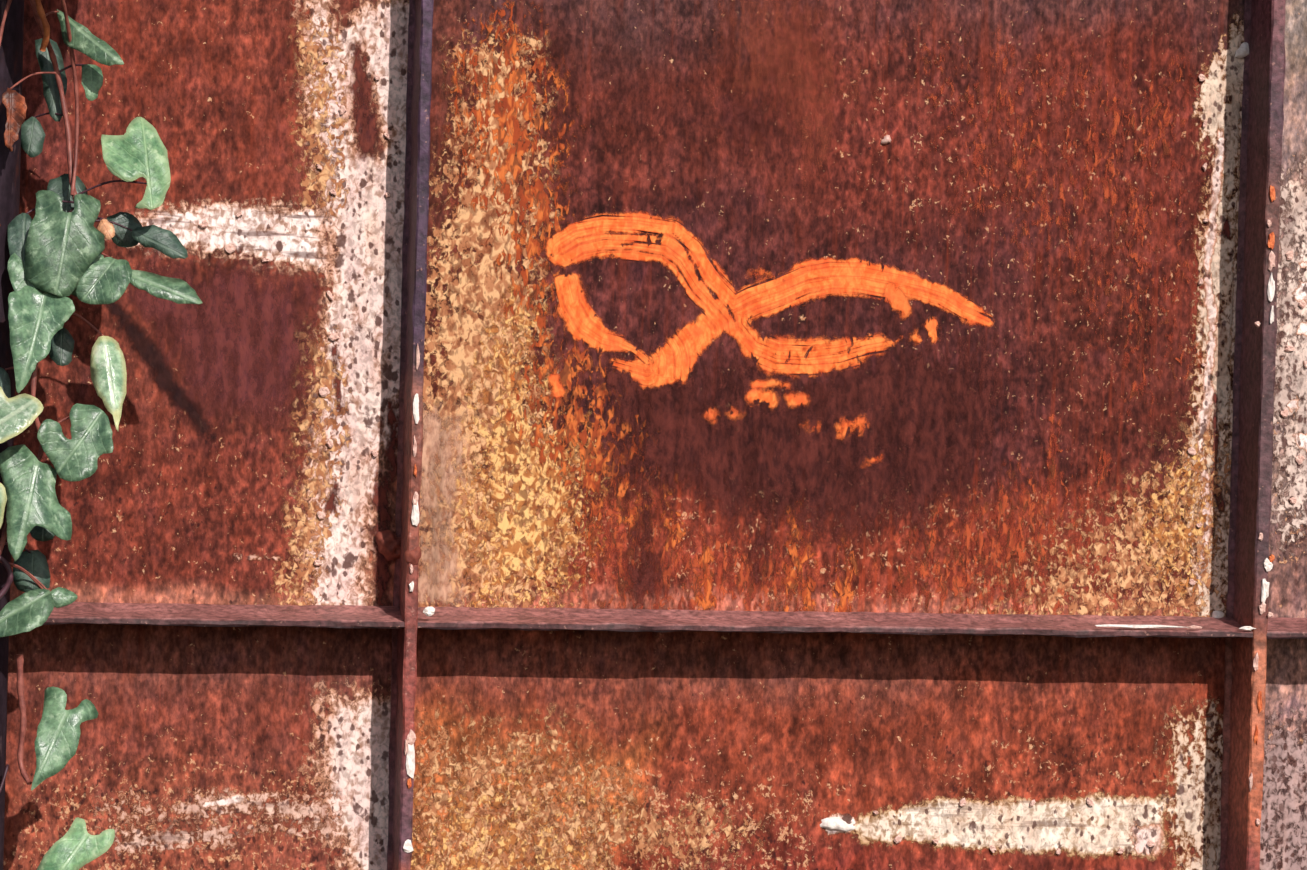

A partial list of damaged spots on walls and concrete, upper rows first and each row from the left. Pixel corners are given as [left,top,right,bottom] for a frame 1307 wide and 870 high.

peeling [129,0,419,606]
corrosion [370,3,857,612]
corrosion [924,56,1195,398]
peeling [1095,11,1249,629]
peeling [1239,153,1307,631]
corrosion [875,414,1232,617]
peeling [83,681,413,870]
peeling [405,729,416,788]
corrosion [411,711,761,870]
peeling [820,698,1223,870]
peeling [1249,691,1307,870]